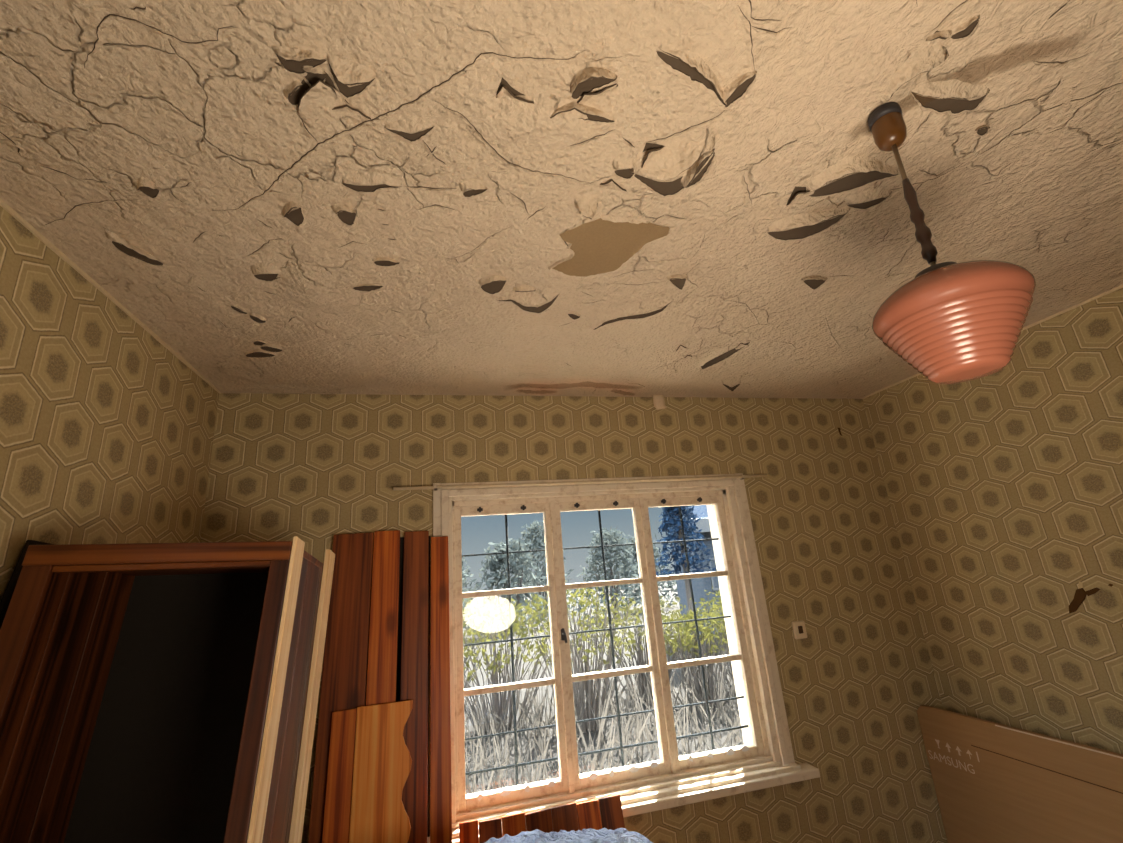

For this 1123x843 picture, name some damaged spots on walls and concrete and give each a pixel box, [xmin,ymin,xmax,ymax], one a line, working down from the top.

crack [0,132,139,226]
crack [84,7,237,69]
peeling [271,45,376,132]
crack [193,50,592,264]
peeling [550,67,618,127]
spalling [548,128,716,277]
crack [571,110,725,148]
peeling [654,43,757,110]
crack [737,0,790,72]
peeling [765,157,898,242]
peeling [880,14,990,116]
crack [924,0,972,38]